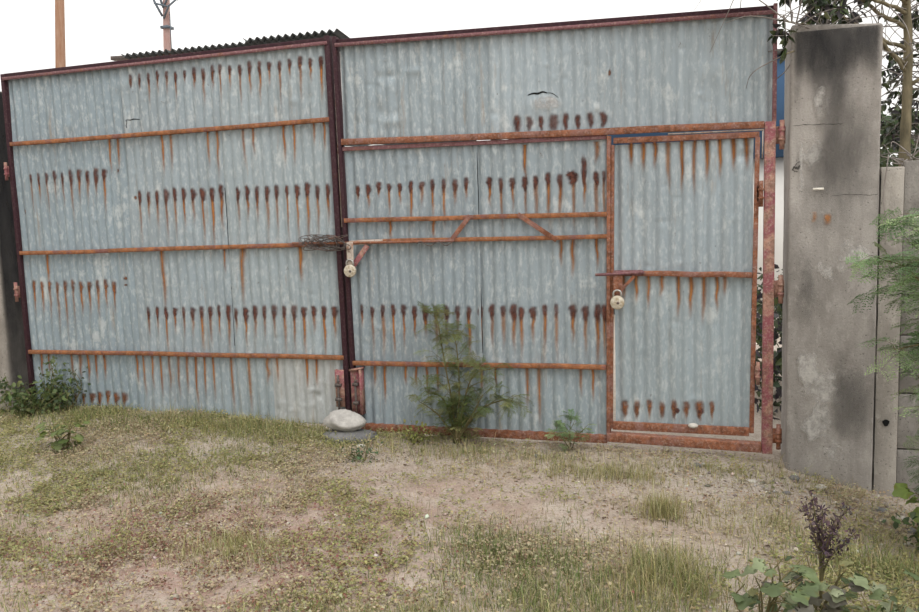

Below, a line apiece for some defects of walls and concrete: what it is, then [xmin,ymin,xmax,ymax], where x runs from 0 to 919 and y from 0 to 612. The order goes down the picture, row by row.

rust [129,56,323,92]
rust [514,112,607,132]
rust [29,139,119,198]
rust [134,185,223,231]
rust [236,183,330,224]
rust [356,178,468,214]
rust [486,145,605,210]
rust [680,138,748,178]
rust [32,255,127,311]
rust [147,305,338,343]
rust [361,305,558,343]
rust [622,400,714,418]